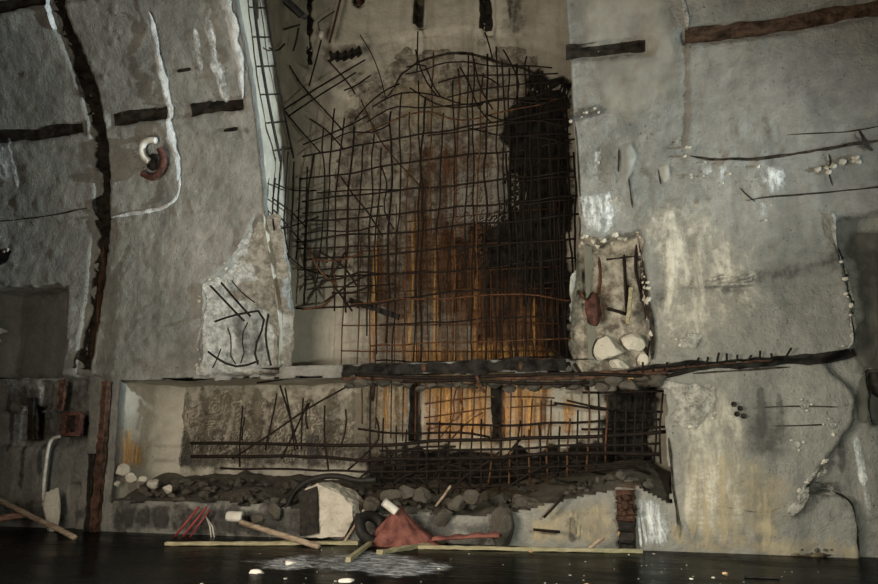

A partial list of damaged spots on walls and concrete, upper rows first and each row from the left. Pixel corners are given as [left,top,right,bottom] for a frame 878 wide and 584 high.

crack [690,126,878,201]
crack [0,208,87,227]
spalling [190,0,773,494]
rust [341,222,571,439]
crack [835,492,859,549]